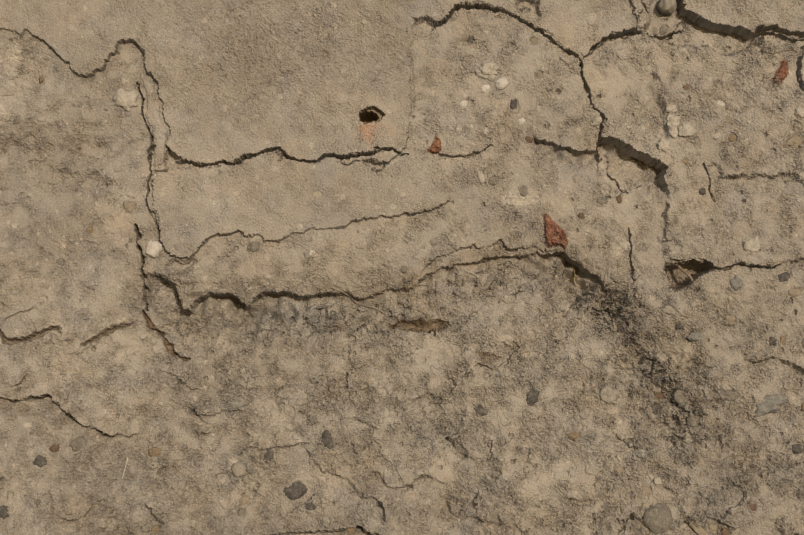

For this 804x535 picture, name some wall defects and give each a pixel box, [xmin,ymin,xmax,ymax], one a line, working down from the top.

crack [446,0,684,152]
crack [179,146,409,168]
flaking render [0,0,804,327]
crack [439,145,493,160]
crack [606,173,629,194]
crack [702,163,715,202]
crack [79,83,191,361]
crack [628,228,636,282]
crack [710,262,782,271]
crack [0,325,63,347]
crack [0,395,139,440]
crack [272,526,379,535]